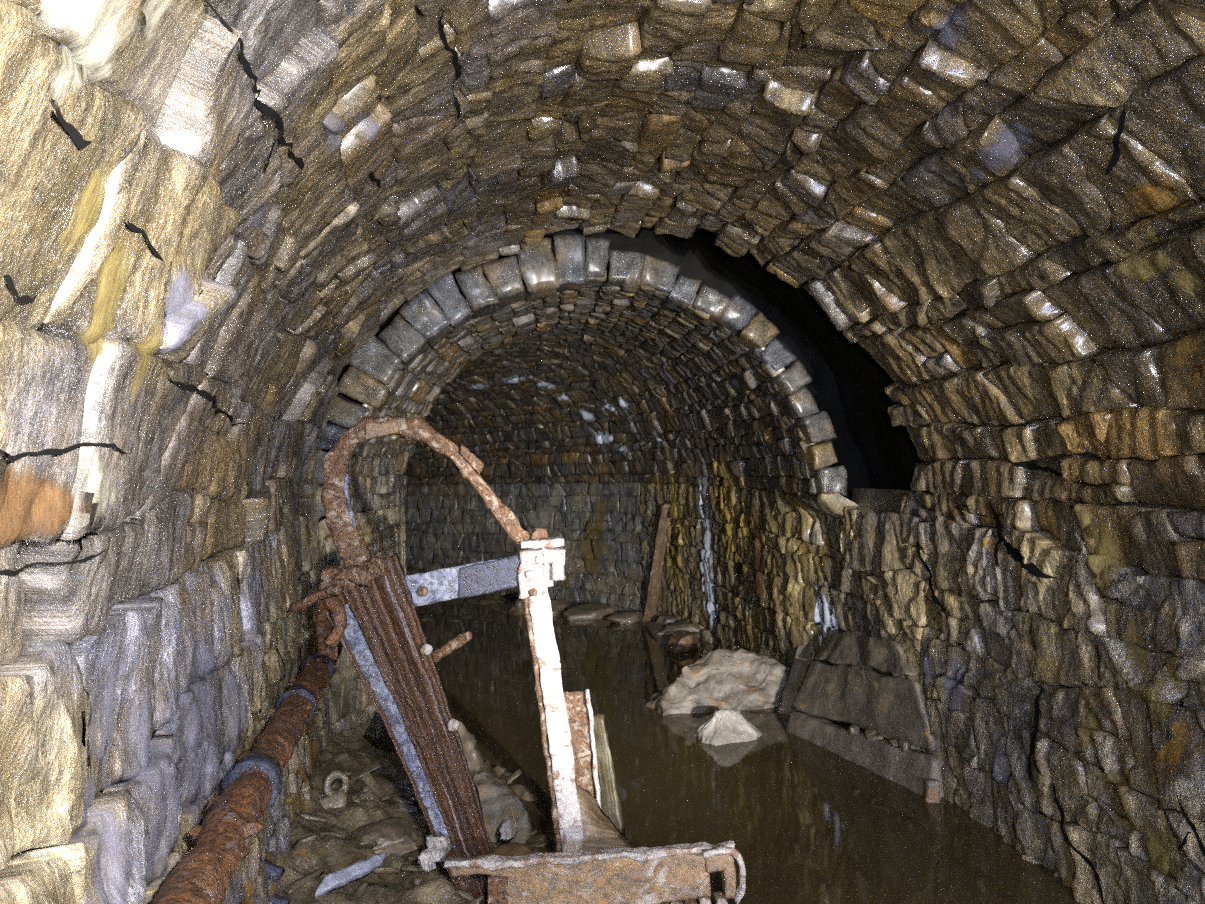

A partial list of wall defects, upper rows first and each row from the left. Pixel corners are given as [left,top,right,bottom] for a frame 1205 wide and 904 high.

crack [204,0,304,173]
crack [51,98,92,150]
crack [5,274,38,304]
crack [0,442,127,463]
corrosion [0,467,79,547]